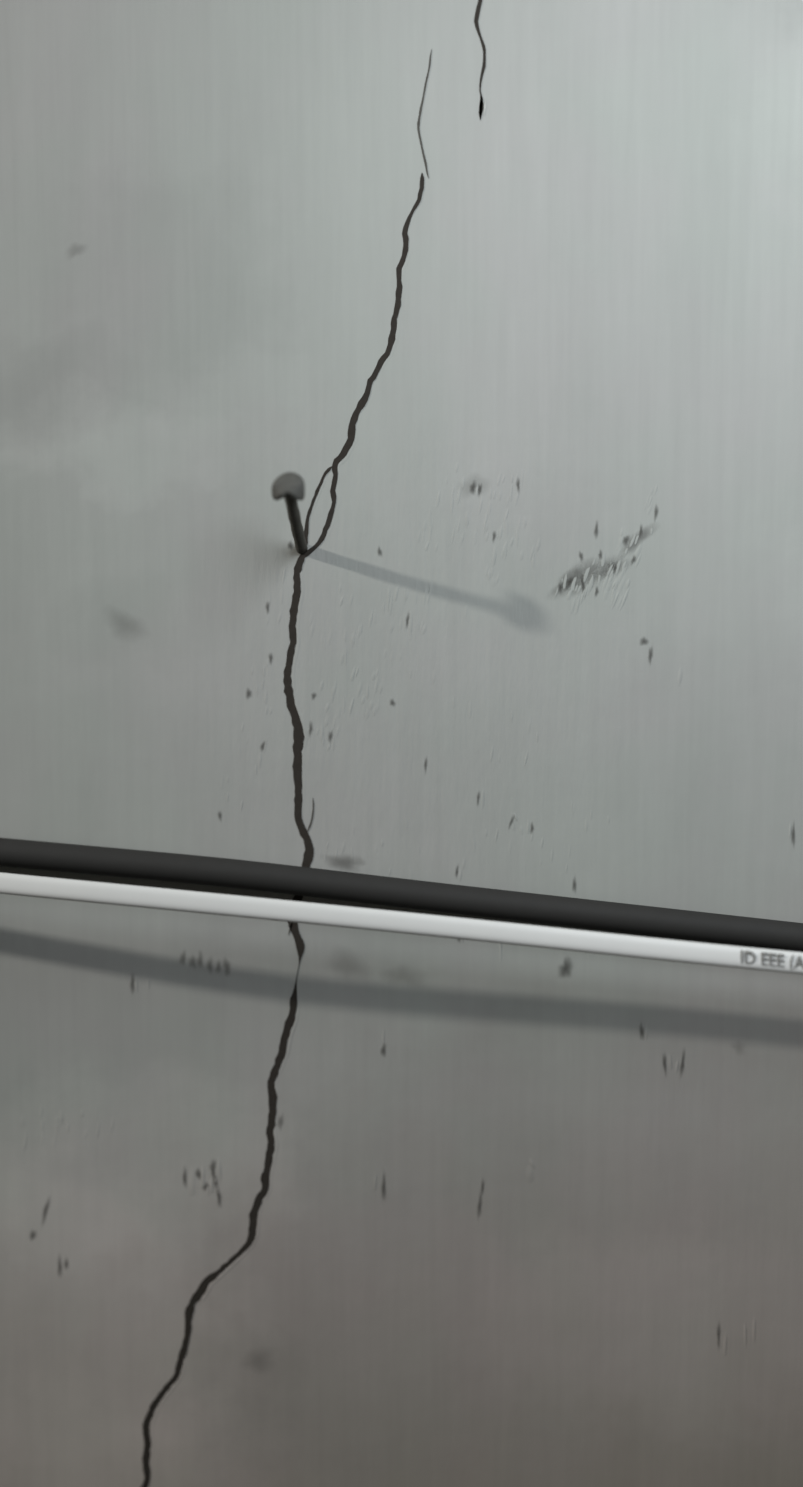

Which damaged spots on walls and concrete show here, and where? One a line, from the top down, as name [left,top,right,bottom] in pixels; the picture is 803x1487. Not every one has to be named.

crack [141,49,432,1487]
crack [474,0,488,120]